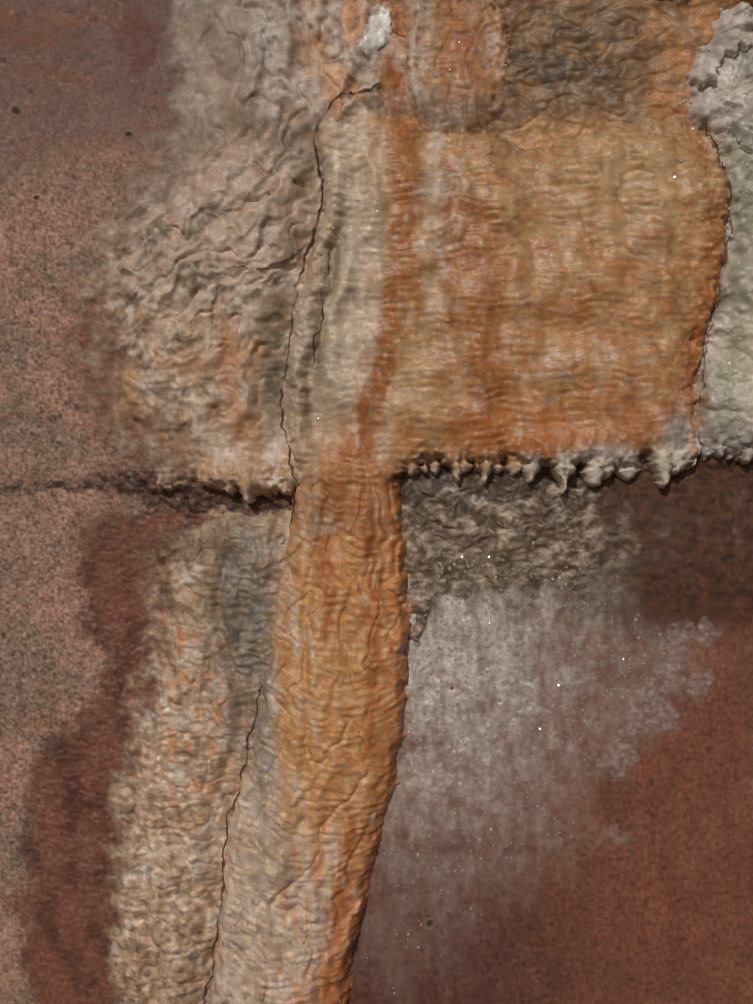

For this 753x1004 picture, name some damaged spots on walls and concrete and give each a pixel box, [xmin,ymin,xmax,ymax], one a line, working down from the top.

crack [19,479,151,500]
crack [233,82,381,544]
corrosion [347,293,399,469]
water stain [12,507,204,1004]
crack [203,685,263,1004]
corrosion [325,819,354,997]
water stain [348,454,753,1004]